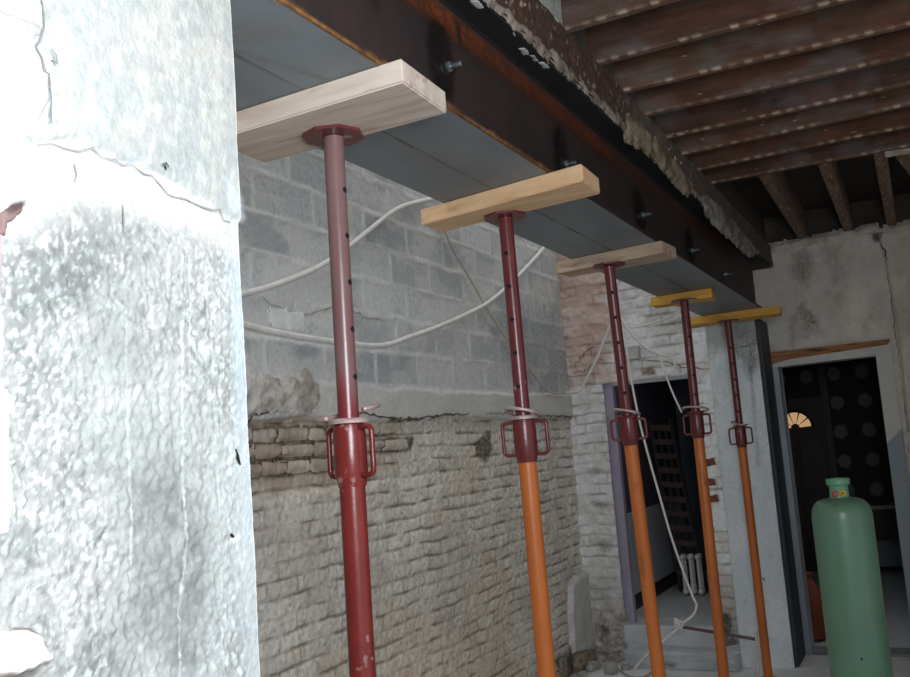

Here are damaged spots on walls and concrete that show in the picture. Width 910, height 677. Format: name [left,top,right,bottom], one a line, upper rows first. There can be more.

corrosion [280,0,387,66]
crack [35,0,238,222]
peeling [0,86,34,296]
crack [873,233,910,453]
peeling [0,386,14,534]
spalling [235,425,334,478]
spalling [366,437,414,454]
spalling [0,627,53,677]